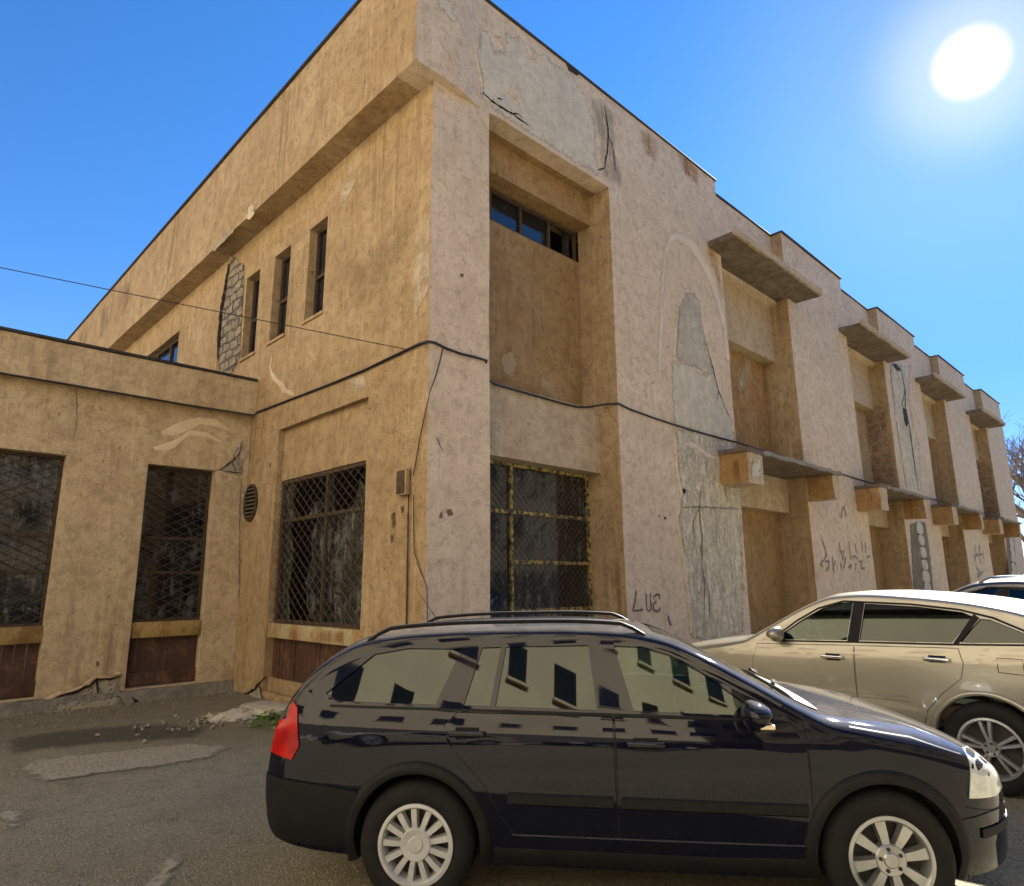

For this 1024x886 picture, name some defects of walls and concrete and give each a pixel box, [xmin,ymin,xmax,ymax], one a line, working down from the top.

crack [483,93,530,127]
peeling [475,26,599,175]
crack [597,105,616,173]
flaking render [215,256,244,374]
spalling [867,363,924,495]
crack [901,370,919,489]
crack [217,442,242,596]
crack [681,489,737,615]
flaking render [910,522,934,591]
crack [42,676,139,712]